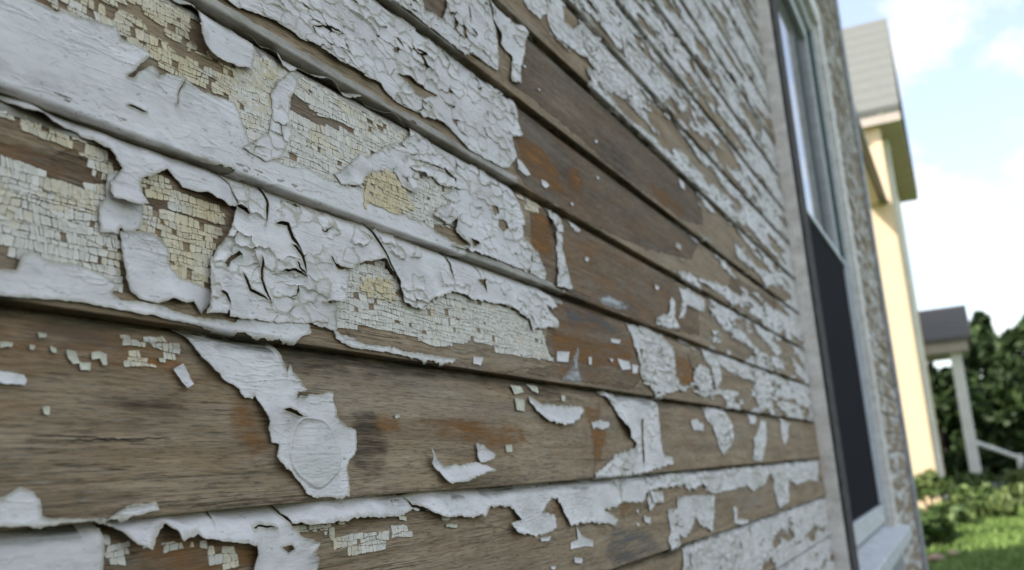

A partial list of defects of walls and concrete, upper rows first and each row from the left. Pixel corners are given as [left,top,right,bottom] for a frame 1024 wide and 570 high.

peeling [172,0,255,69]
peeling [388,0,531,83]
crack [276,221,304,275]
peeling [0,30,837,570]